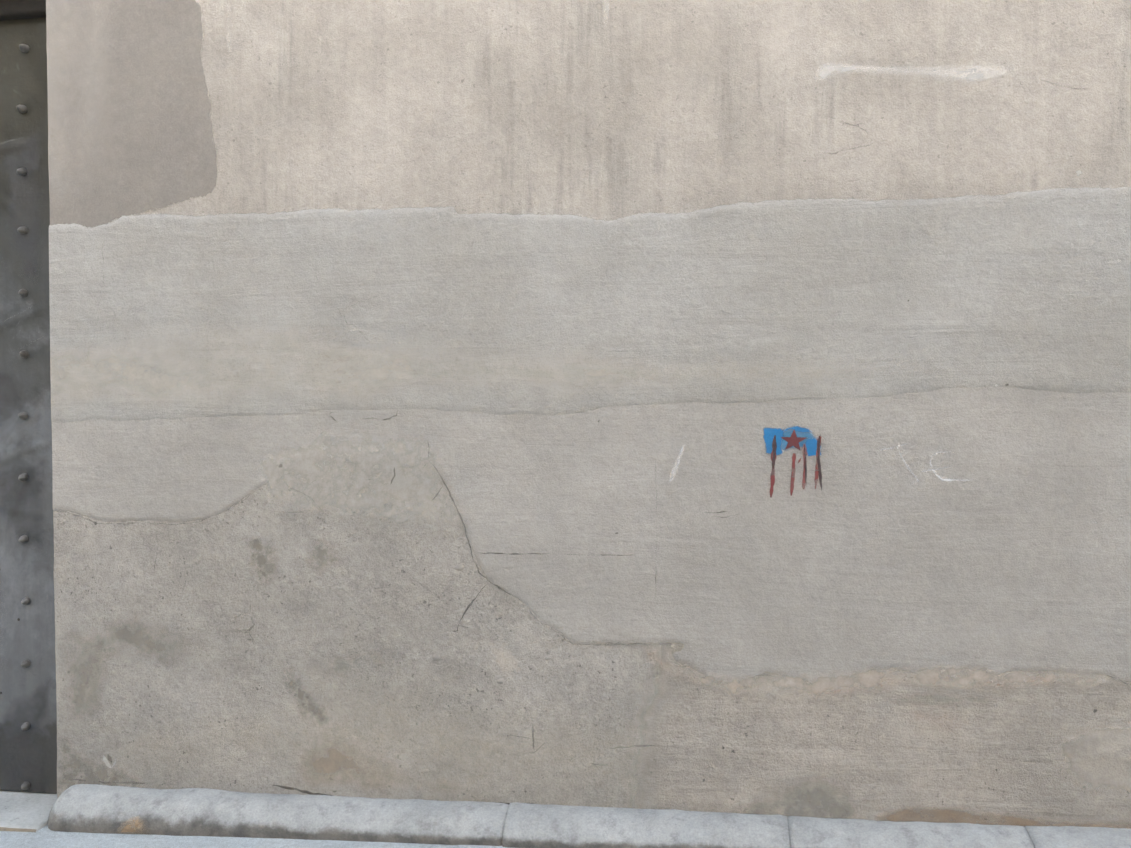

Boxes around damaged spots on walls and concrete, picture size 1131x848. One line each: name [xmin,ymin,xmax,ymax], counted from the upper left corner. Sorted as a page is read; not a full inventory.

crack [423,444,576,632]